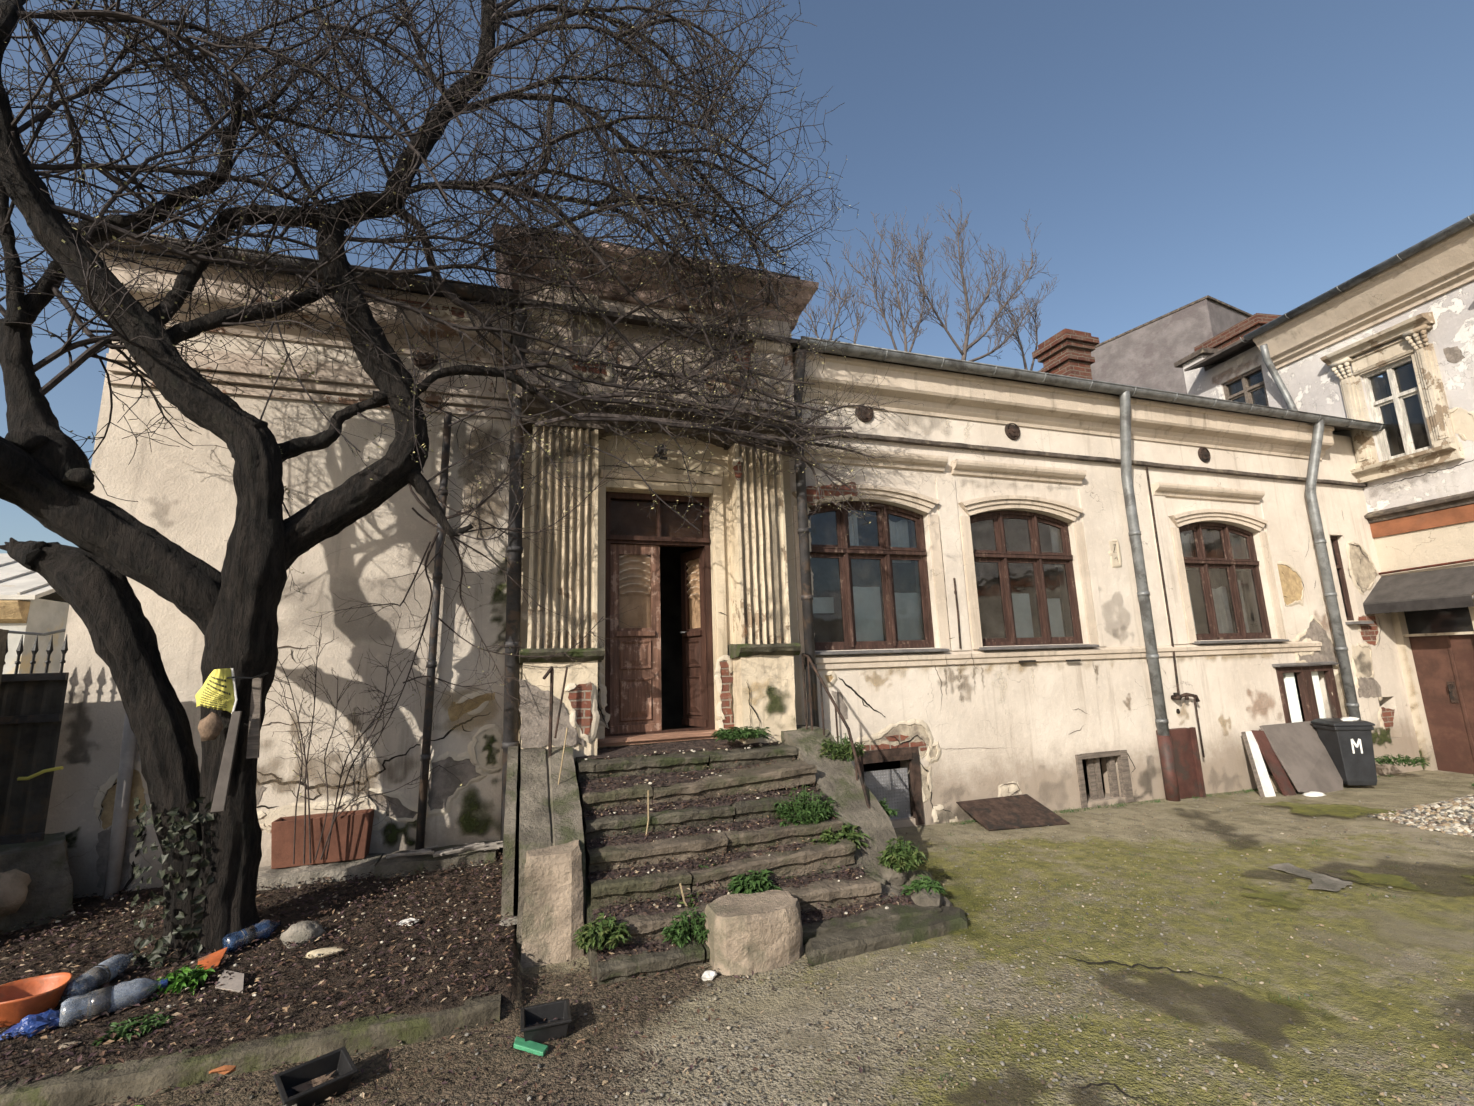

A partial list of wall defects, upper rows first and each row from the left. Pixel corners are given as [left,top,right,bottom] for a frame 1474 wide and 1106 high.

peeling [1443,346,1465,363]
spalling [1346,540,1378,596]
peeling [1277,561,1395,730]
spalling [291,663,610,831]
spalling [855,718,959,823]